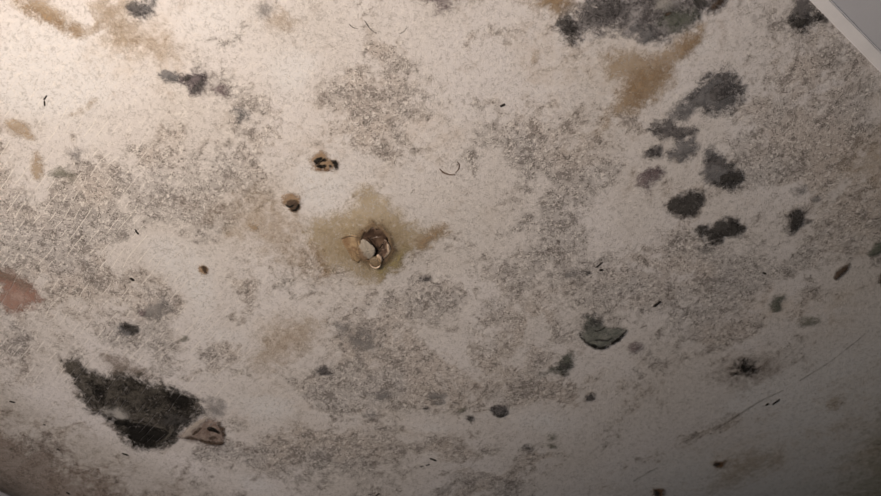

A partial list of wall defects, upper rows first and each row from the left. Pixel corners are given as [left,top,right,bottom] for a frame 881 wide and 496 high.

mould [788,0,827,32]
water stain [537,0,727,113]
mould [637,70,747,251]
peeling [579,312,627,350]
mould [733,359,755,376]